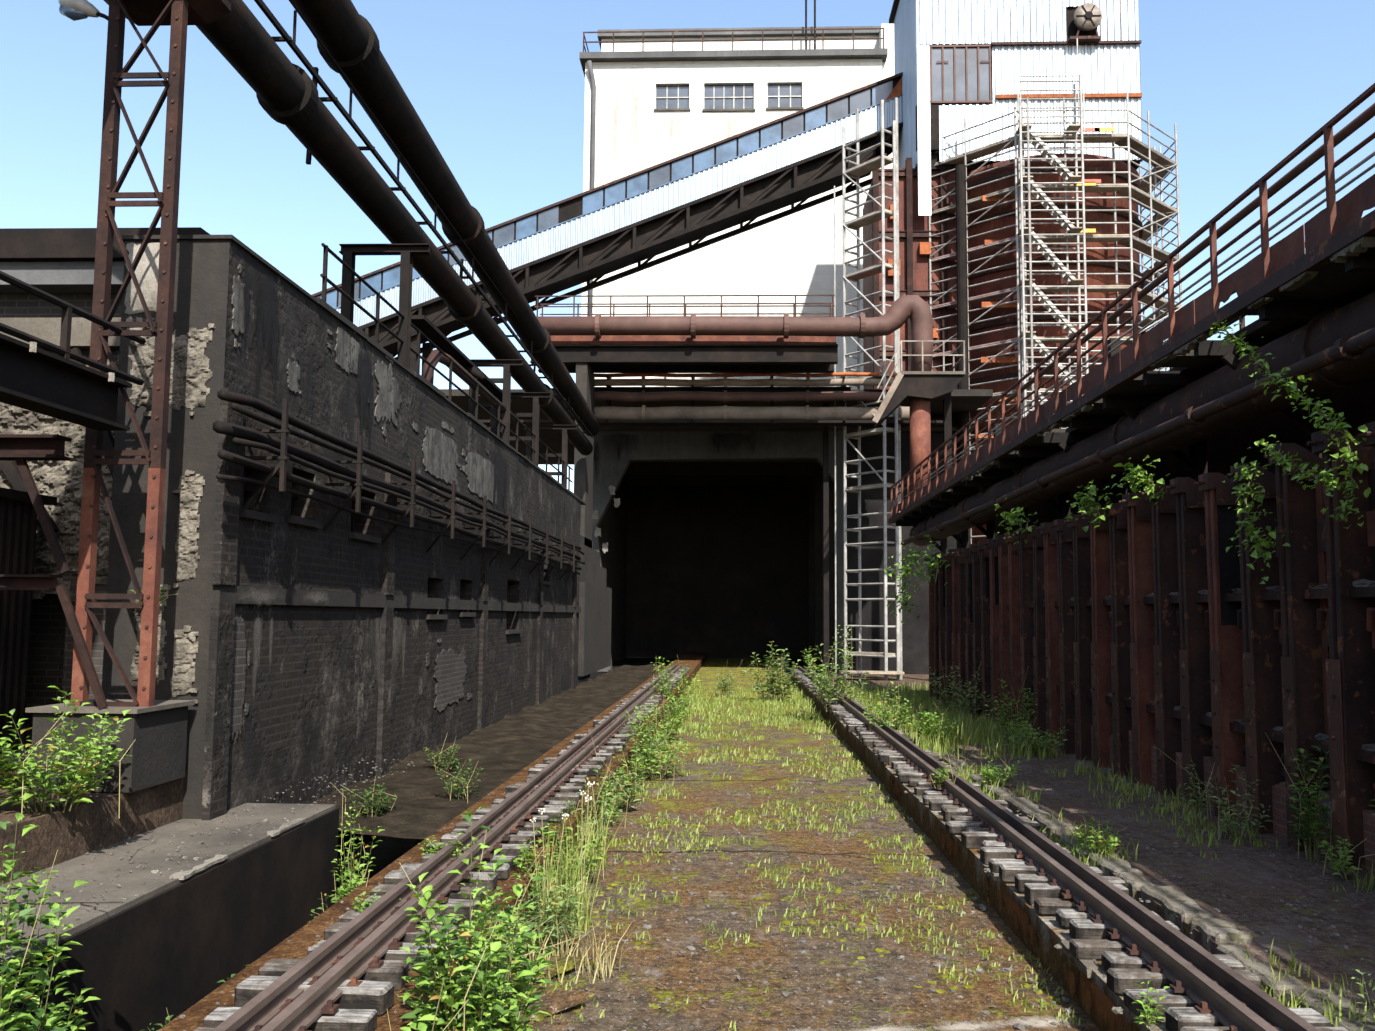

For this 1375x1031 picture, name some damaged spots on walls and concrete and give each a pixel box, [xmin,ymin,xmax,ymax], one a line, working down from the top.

spalling [127,264,251,417]
spalling [130,599,142,680]
spalling [156,470,205,704]